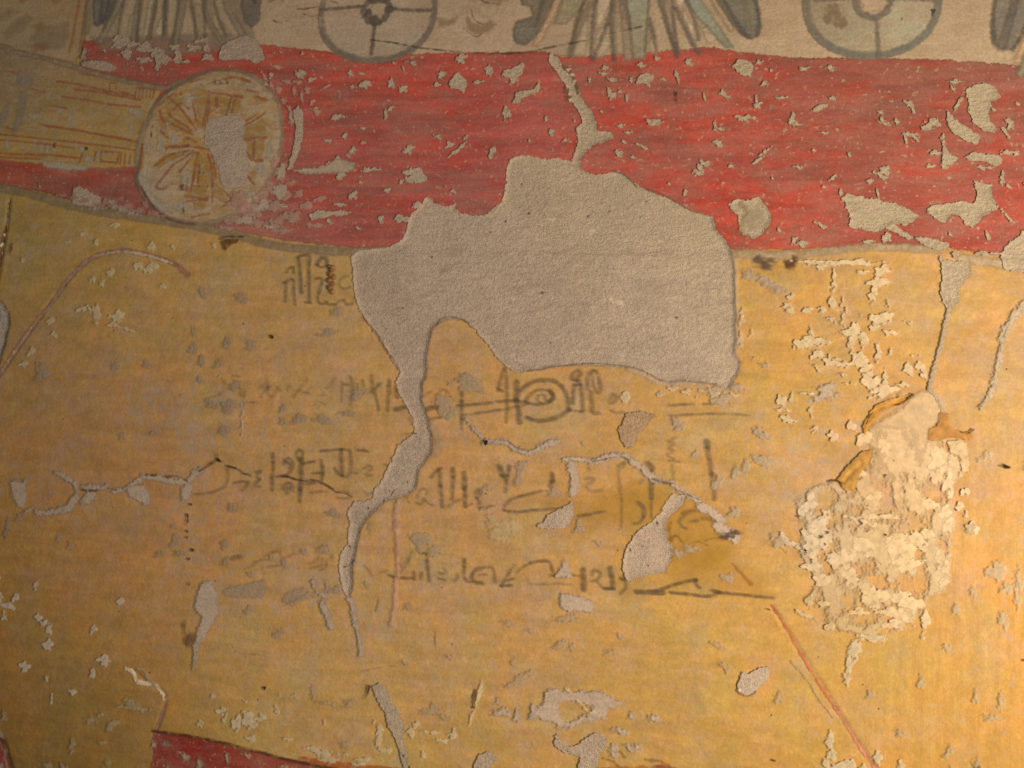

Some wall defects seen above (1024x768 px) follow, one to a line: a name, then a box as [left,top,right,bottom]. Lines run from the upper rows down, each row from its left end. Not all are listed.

flaking render [81,34,382,250]
flaking render [56,185,167,228]
flaking render [0,302,10,359]
peeling [76,303,138,333]
flaking render [280,53,1024,687]
crack [979,300,1024,411]
crack [465,418,741,544]
flaking render [192,572,268,670]
peeling [211,693,297,759]
flaking render [491,659,642,768]